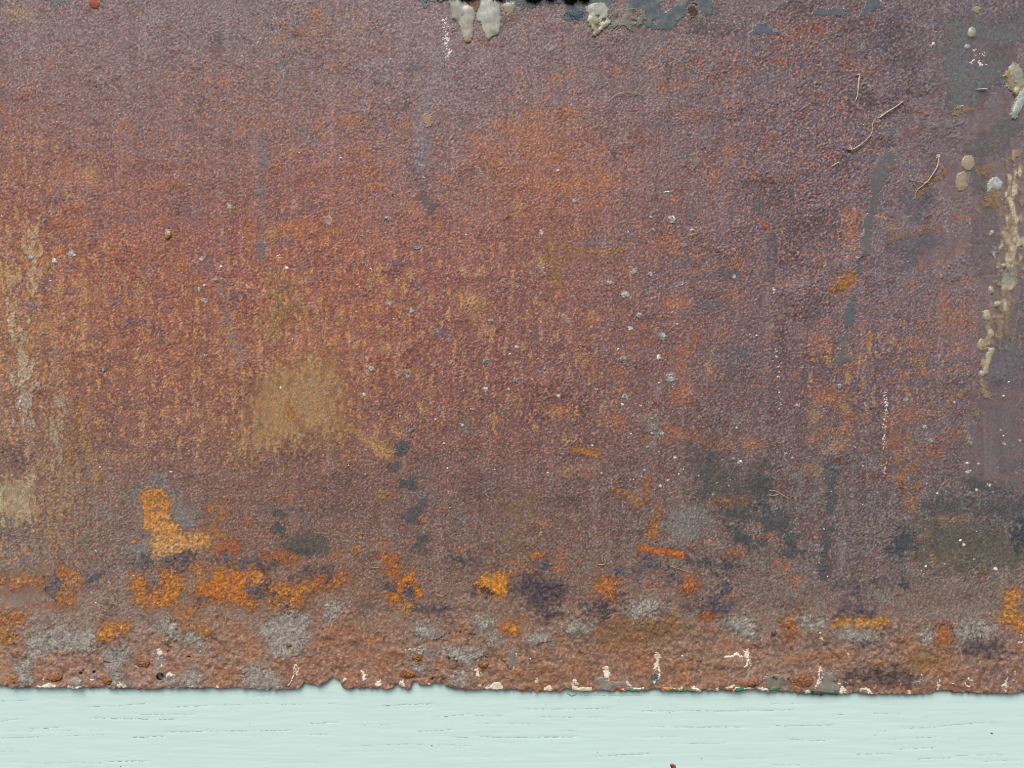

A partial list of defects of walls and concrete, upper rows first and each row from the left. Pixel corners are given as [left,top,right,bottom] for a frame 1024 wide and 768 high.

peeling [499,0,714,39]
peeling [941,10,1024,117]
rust [969,31,1024,78]
peeling [960,114,1023,195]
peeling [962,205,1004,283]
peeling [978,288,1024,389]